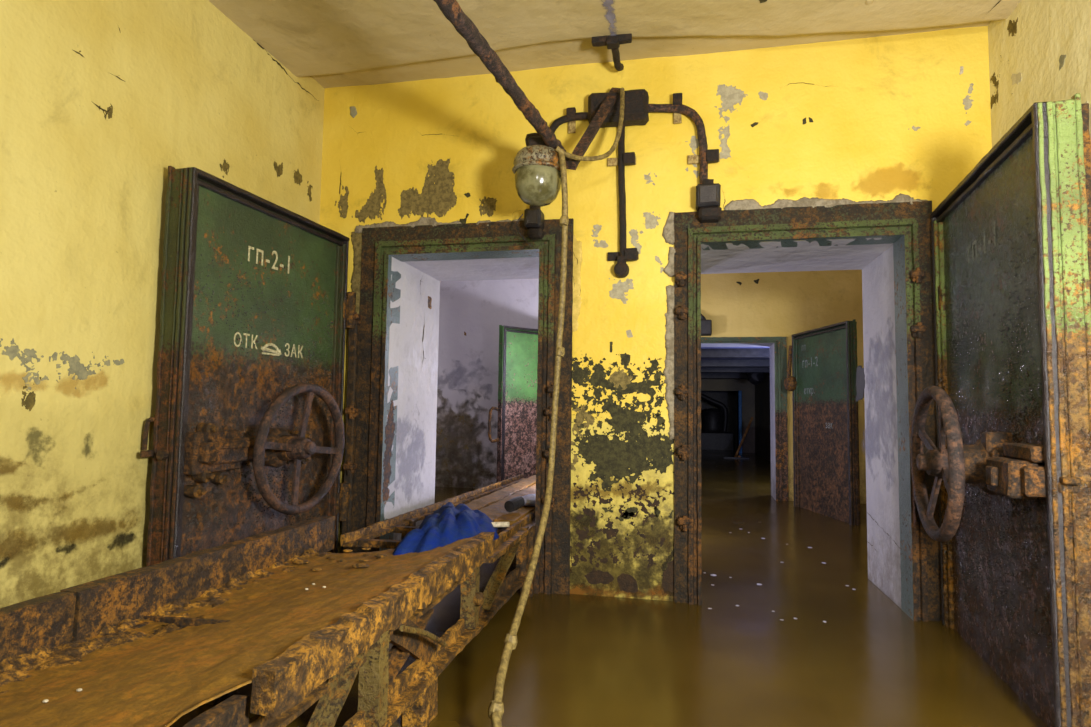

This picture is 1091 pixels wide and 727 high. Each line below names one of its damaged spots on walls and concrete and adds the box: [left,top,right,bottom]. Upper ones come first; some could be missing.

peeling [714,84,768,159]
peeling [335,159,524,314]
peeling [0,338,125,411]
damp [0,459,21,474]
damp [0,532,37,567]
damp [6,496,46,510]
damp [27,429,44,459]
damp [54,520,136,553]
damp [435,390,497,488]
damp [570,479,674,599]